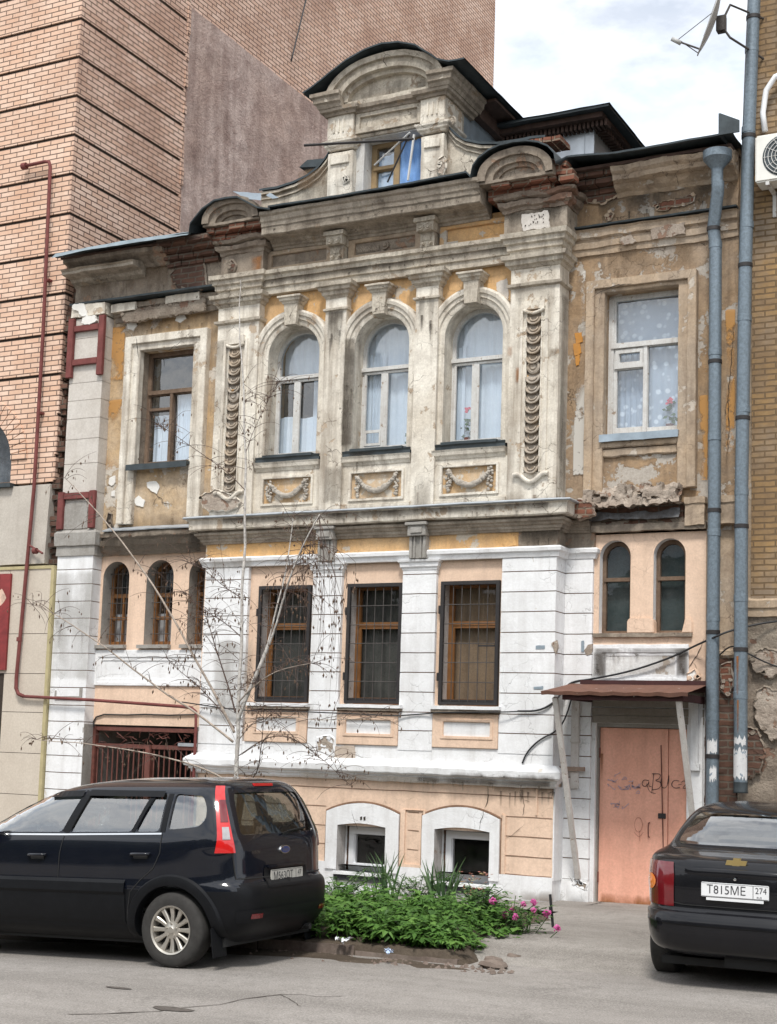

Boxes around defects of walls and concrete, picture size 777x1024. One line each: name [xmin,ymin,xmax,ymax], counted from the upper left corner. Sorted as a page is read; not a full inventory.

peeling [111,326,125,380]
peeling [573,332,583,366]
peeling [725,309,735,348]
peeling [108,399,122,416]
peeling [573,387,584,475]
peeling [700,395,708,480]
peeling [726,378,735,444]
peeling [134,481,160,507]
spalling [720,661,734,697]
spalling [748,646,777,779]